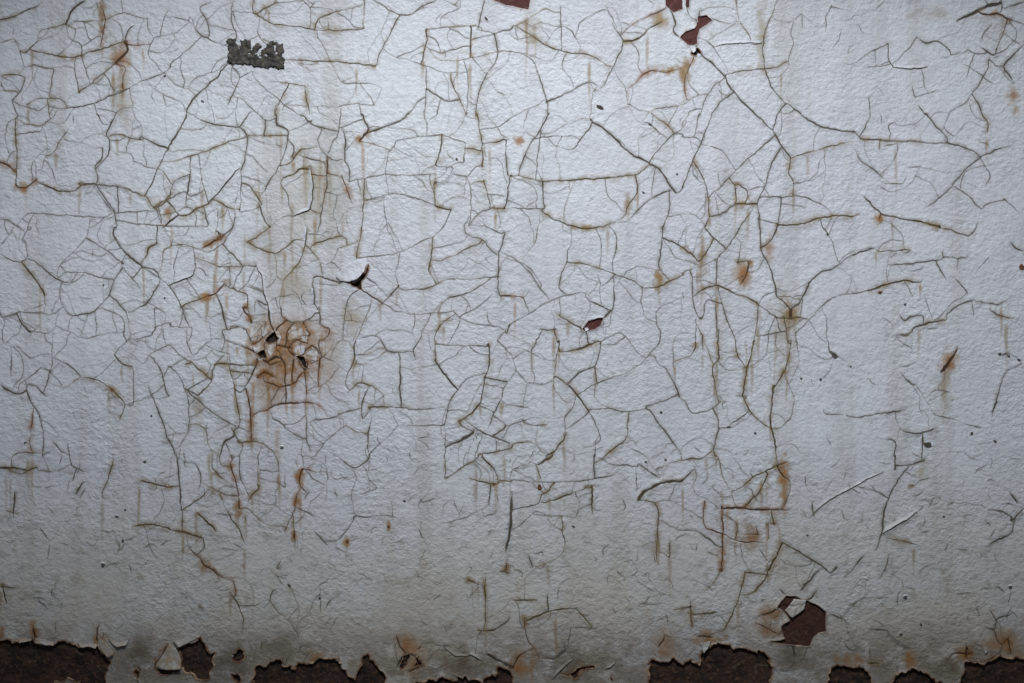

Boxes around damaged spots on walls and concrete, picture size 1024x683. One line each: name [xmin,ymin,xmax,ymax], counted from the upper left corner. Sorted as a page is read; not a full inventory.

peeling [663,0,714,53]
crack [0,0,454,578]
crack [397,0,1024,634]
corrosion [779,461,787,499]
crack [2,586,121,654]
peeling [0,634,129,683]
peeling [157,633,219,683]
peeling [247,651,388,683]
crack [396,566,615,681]
peeling [644,593,829,683]
peeling [824,647,1024,683]
crack [949,587,1011,662]